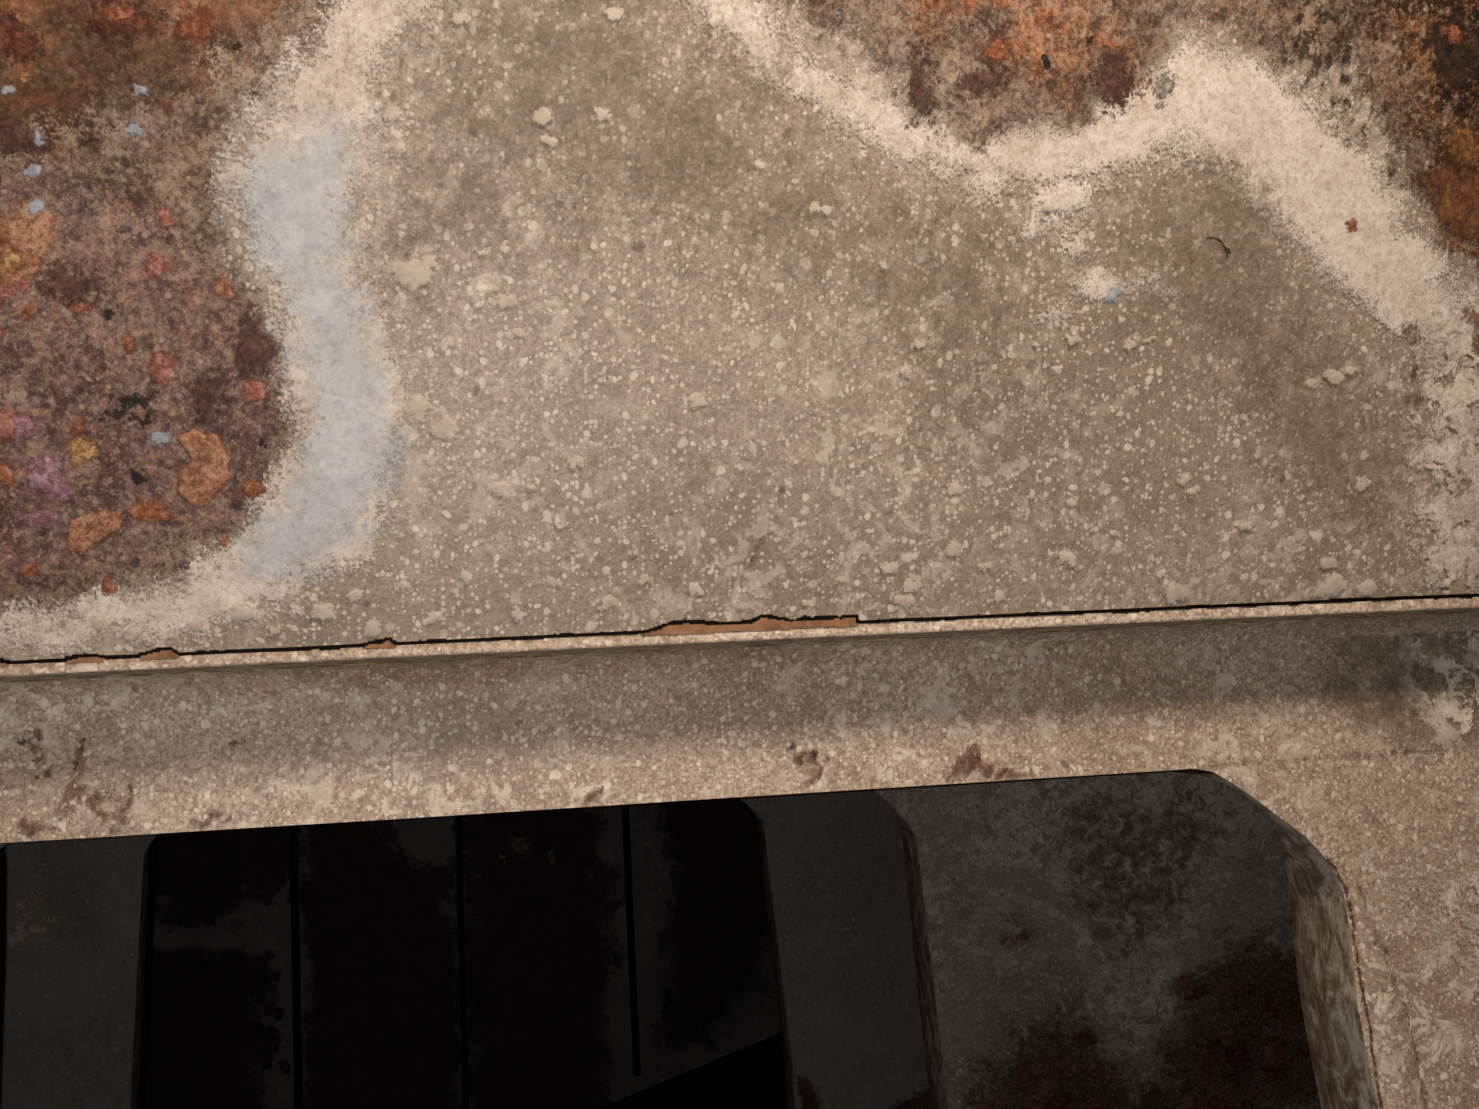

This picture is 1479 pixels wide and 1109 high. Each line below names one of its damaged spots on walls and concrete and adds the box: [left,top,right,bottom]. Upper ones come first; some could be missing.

rust [758,0,1479,269]
rust [0,0,340,622]
water stain [0,0,461,654]
water stain [677,0,1479,590]
rust [1394,323,1423,409]
rust [1461,307,1479,355]
spalling [642,615,860,635]
water stain [940,770,1283,1070]